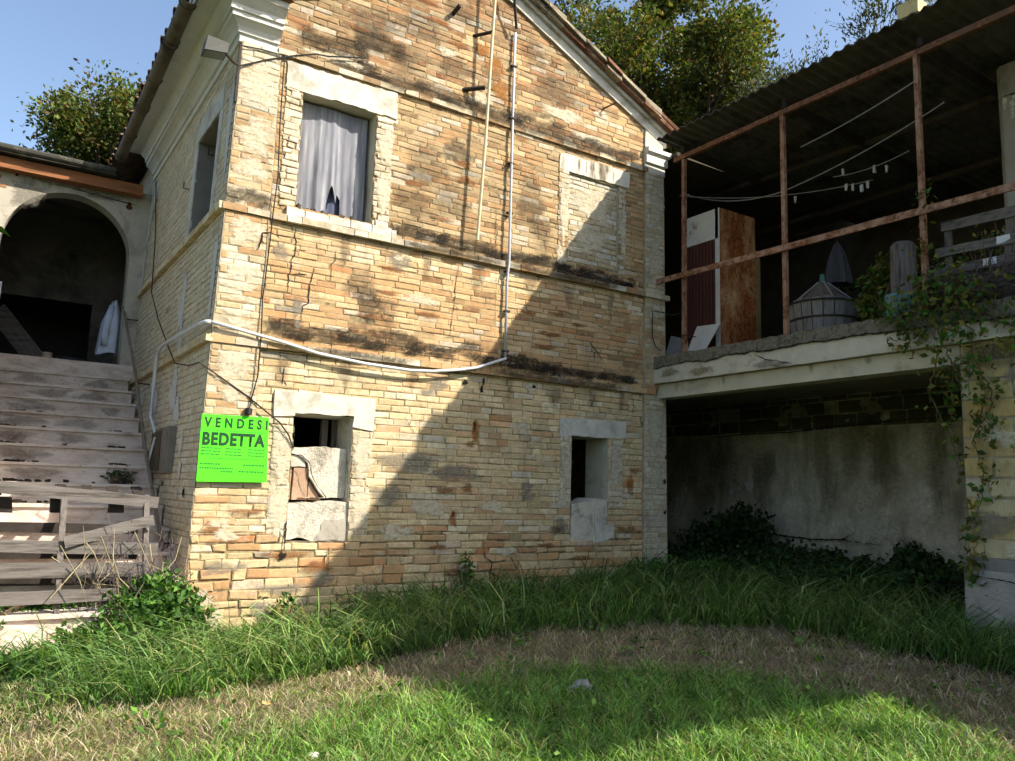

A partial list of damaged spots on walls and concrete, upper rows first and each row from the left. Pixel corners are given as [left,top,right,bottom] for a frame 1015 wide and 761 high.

damp [301,25,640,162]
crack [258,229,336,327]
damp [391,224,635,288]
damp [263,319,637,388]